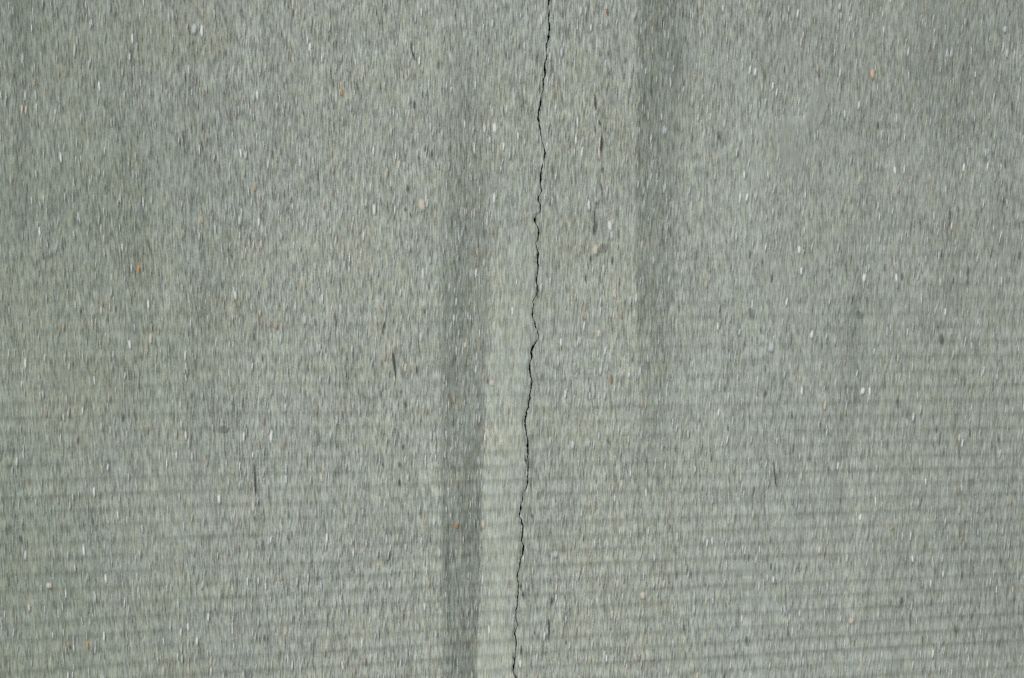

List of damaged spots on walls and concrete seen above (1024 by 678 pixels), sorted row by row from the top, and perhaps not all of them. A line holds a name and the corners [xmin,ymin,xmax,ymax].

crack [512,0,567,678]